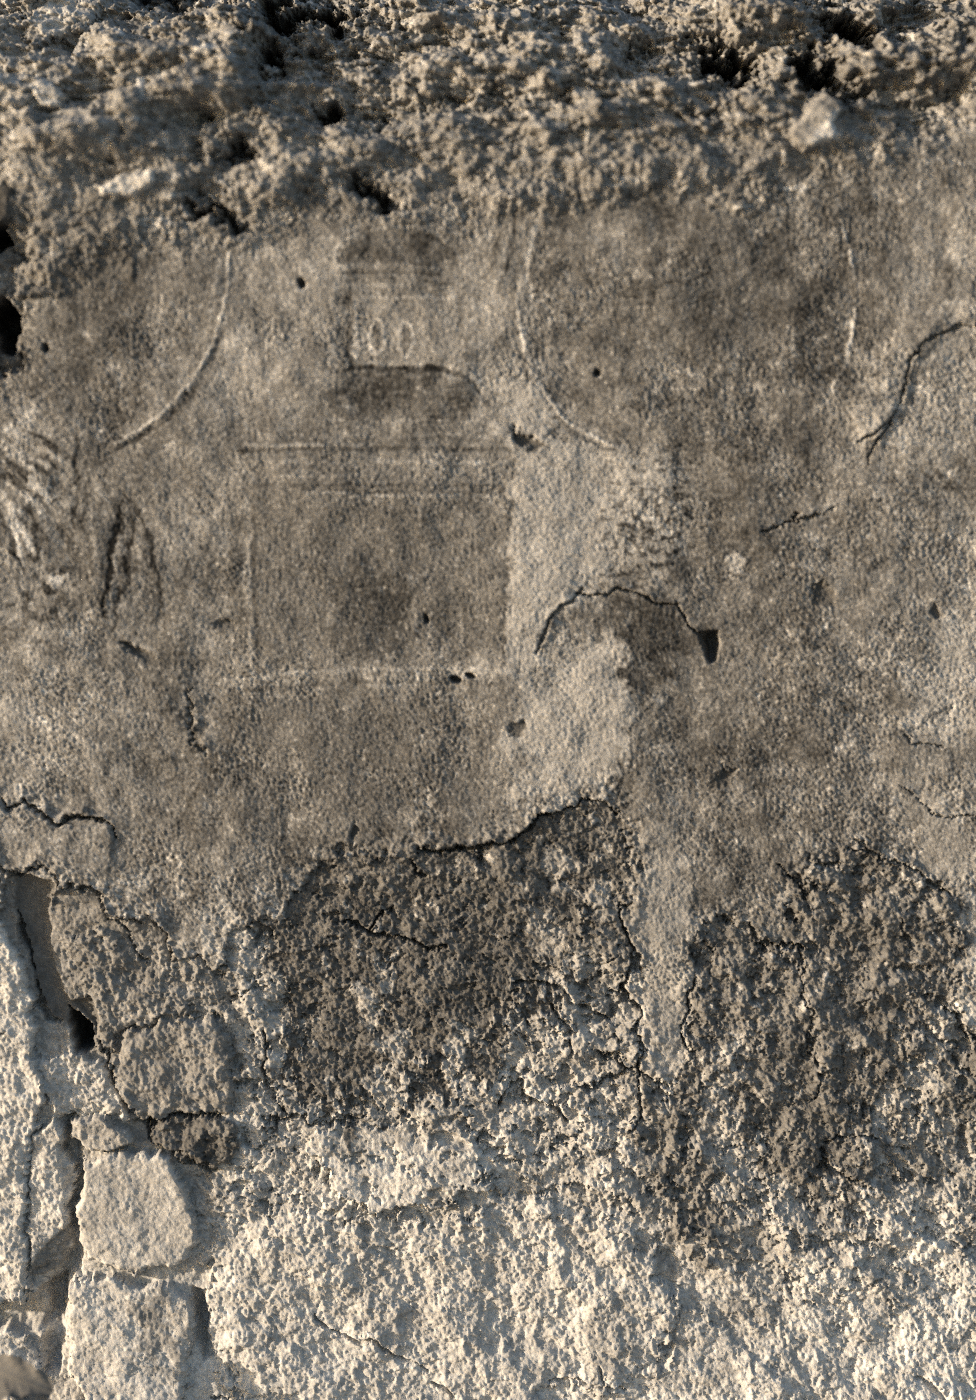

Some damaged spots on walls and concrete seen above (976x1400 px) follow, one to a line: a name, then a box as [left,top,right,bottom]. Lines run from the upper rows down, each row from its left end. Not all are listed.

hole [243,0,365,84]
hole [691,9,893,102]
spalling [336,168,406,218]
peeling [487,364,568,452]
crack [857,322,976,467]
crack [535,585,704,654]
crack [0,796,177,965]
crack [410,796,623,879]
crack [98,1040,223,1174]
flaking render [265,794,645,1141]
crack [496,902,670,1134]
flaking render [670,847,967,1248]